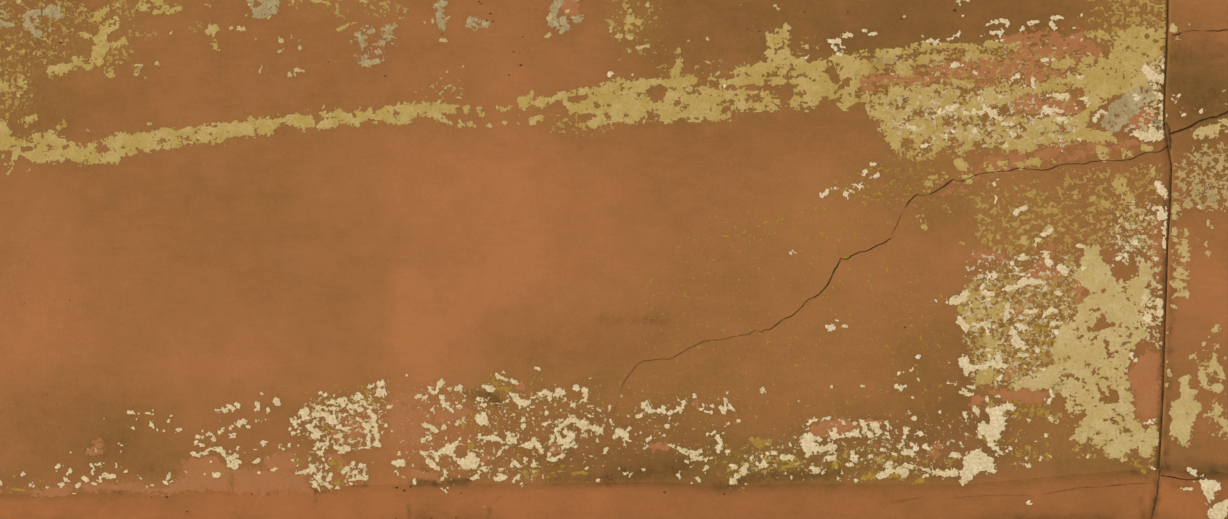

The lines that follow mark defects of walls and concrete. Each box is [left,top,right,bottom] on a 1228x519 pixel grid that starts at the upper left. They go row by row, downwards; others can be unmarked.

spalling [544,0,584,38]
peeling [605,0,670,58]
peeling [0,0,494,175]
crack [613,0,1228,518]
peeling [127,409,182,433]
peeling [215,402,241,413]
peeling [1169,324,1228,448]
peeling [1180,467,1228,519]